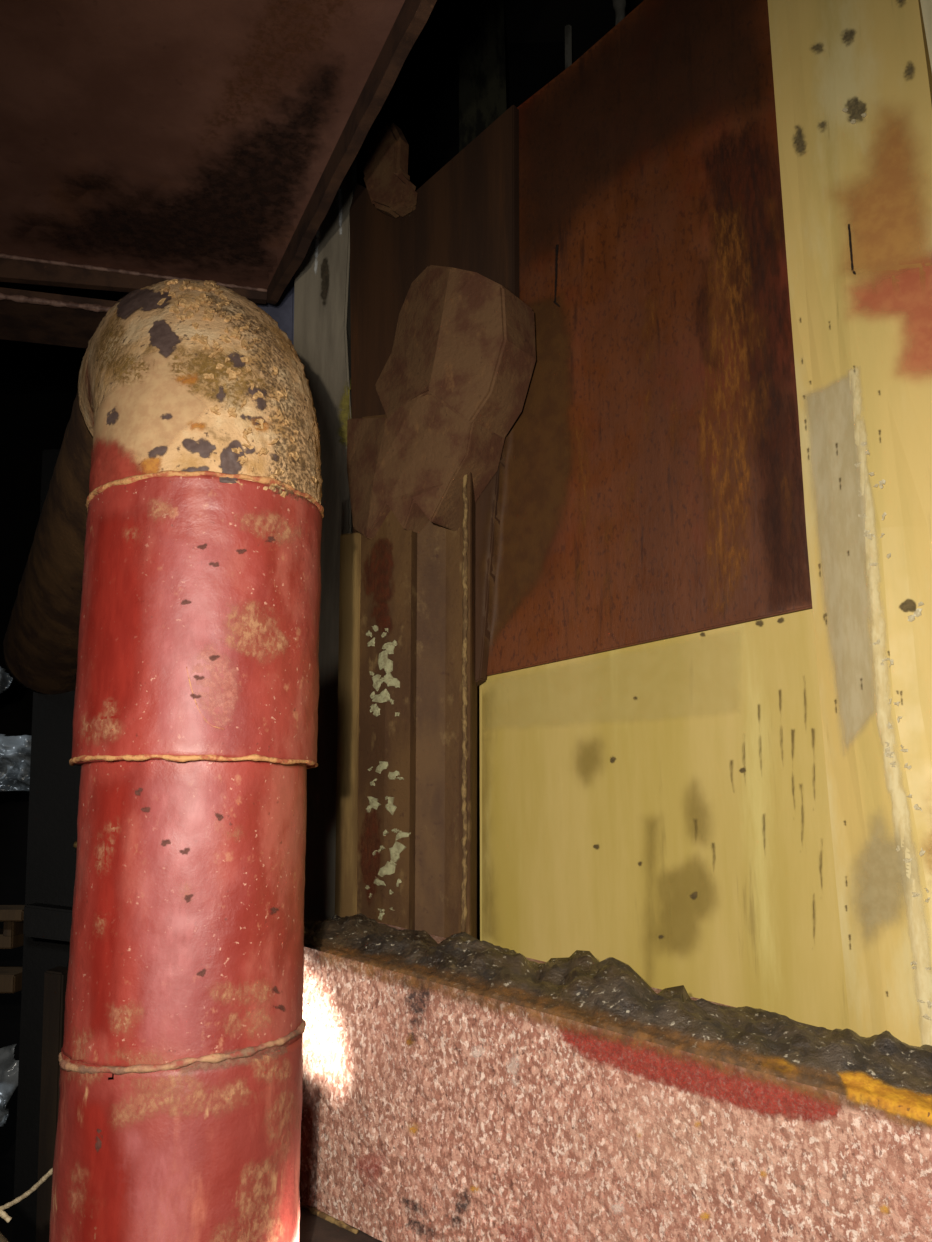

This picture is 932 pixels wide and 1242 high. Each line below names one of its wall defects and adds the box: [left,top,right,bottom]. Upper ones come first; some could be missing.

peeling [106,408,118,425]
peeling [117,279,299,498]
corrosion [706,128,809,606]
peeling [366,625,400,717]
peeling [365,761,411,920]
damp [662,865,708,948]